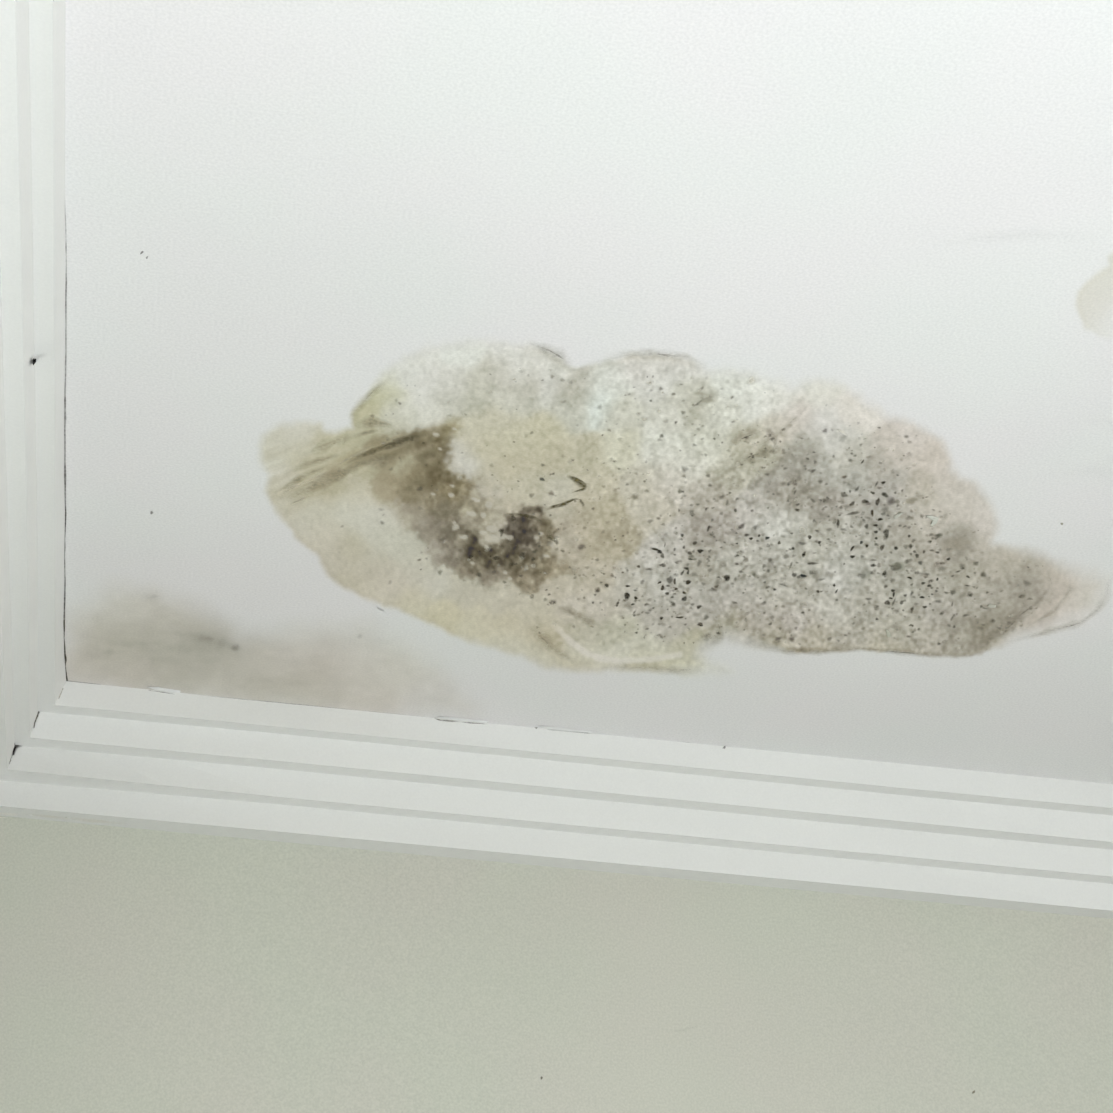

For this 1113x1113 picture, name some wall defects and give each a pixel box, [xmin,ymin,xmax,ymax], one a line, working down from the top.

water stain [1070,247,1113,345]
water stain [63,332,1113,723]